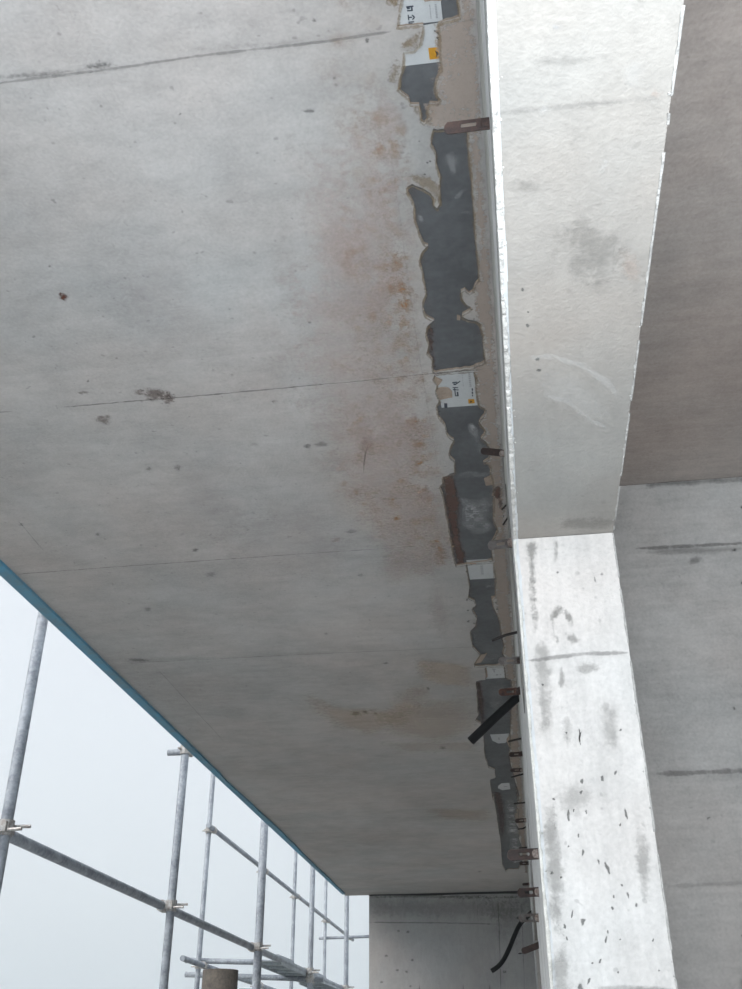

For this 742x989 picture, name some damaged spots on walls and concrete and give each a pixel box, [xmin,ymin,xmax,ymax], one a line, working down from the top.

peeling [397,0,562,989]